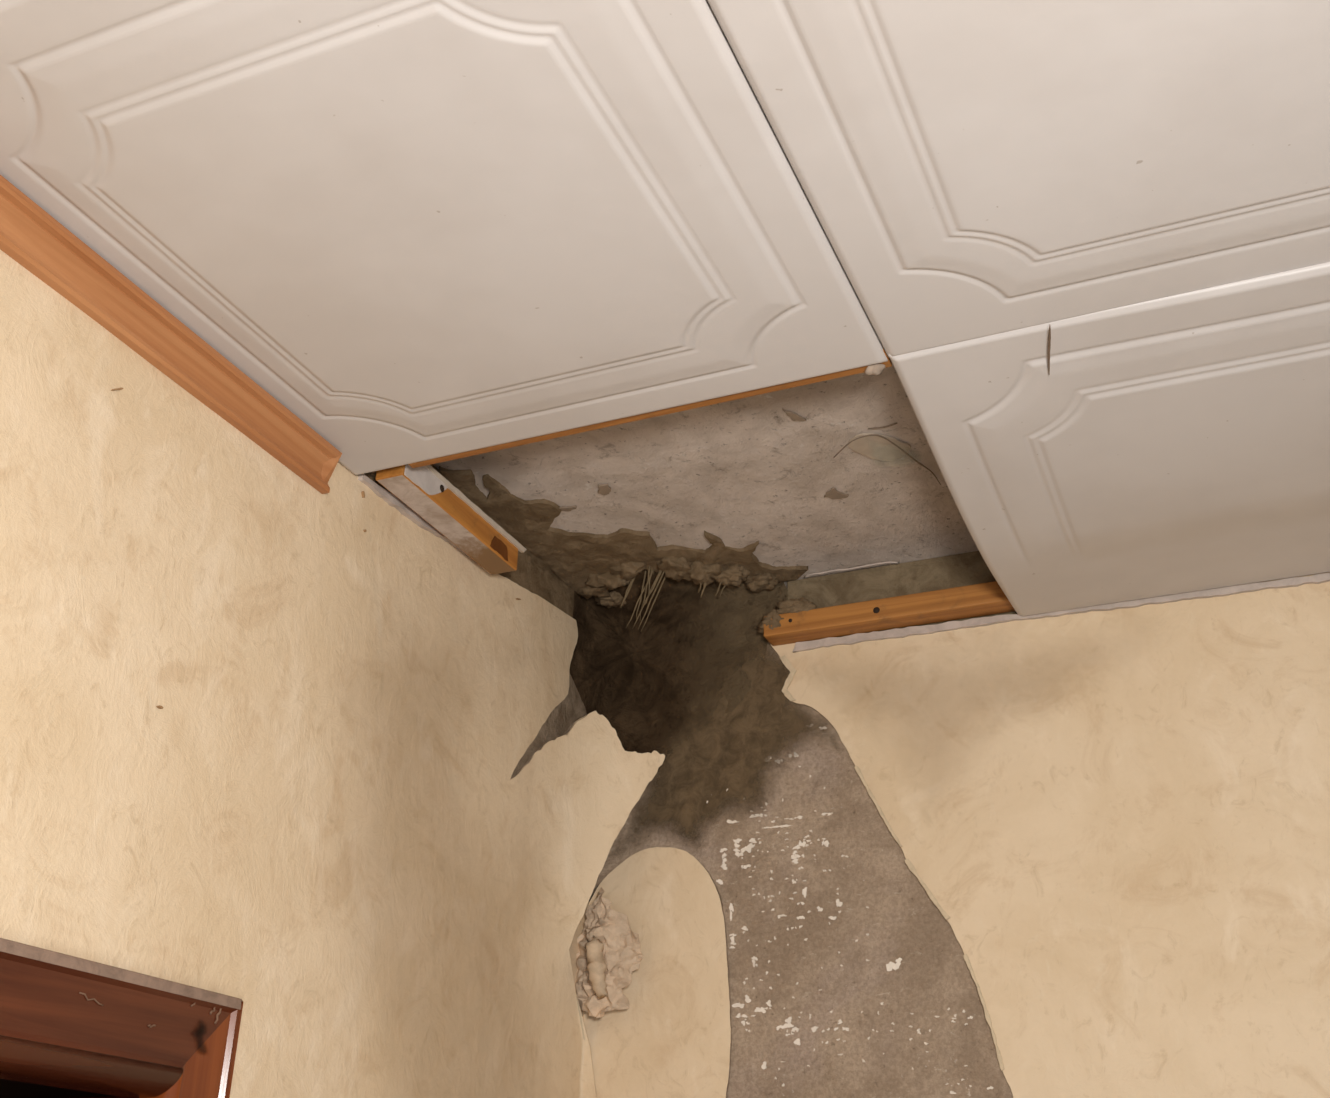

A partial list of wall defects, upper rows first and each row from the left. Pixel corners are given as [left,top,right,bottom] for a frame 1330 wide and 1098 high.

crack [1045,325,1053,375]
peeling [782,408,806,421]
flaking render [365,471,400,500]
damp [634,644,815,841]
flaking render [431,464,1017,1098]